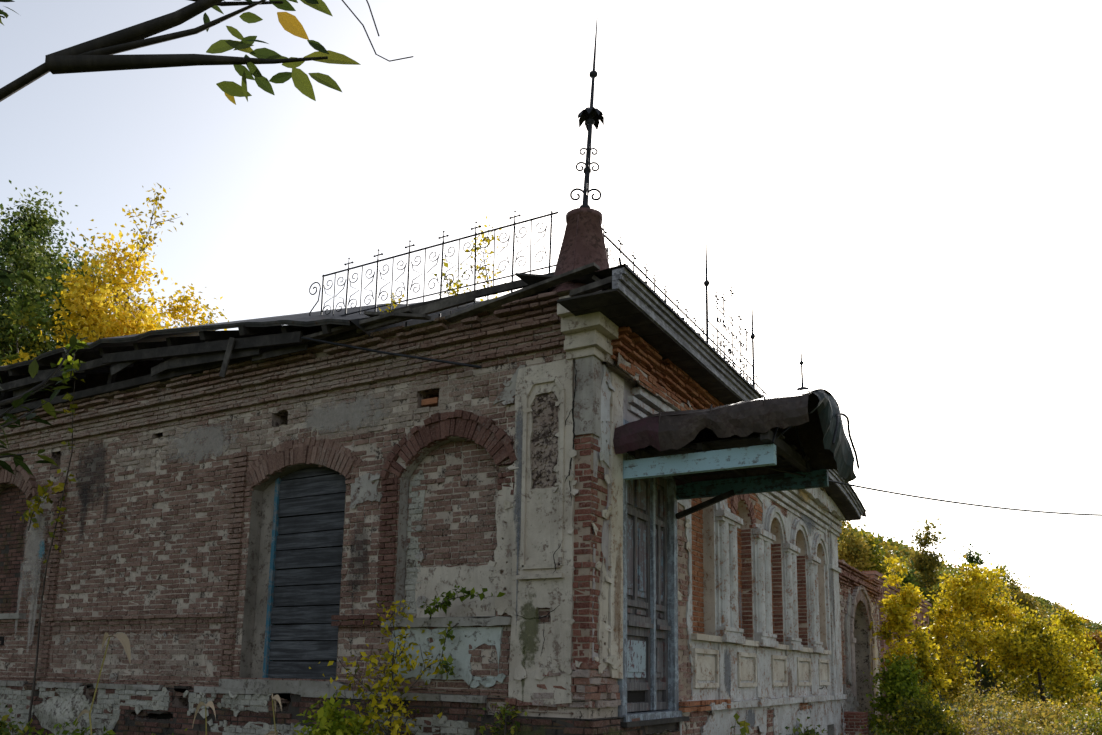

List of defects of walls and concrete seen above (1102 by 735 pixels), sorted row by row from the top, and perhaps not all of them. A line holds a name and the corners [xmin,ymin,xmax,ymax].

flaking render [749,493,789,524]
spalling [389,352,694,708]
flaking render [645,503,731,735]
spalling [0,630,313,735]
peeling [358,710,477,735]
flaking render [747,693,776,735]
flaking render [797,702,814,714]